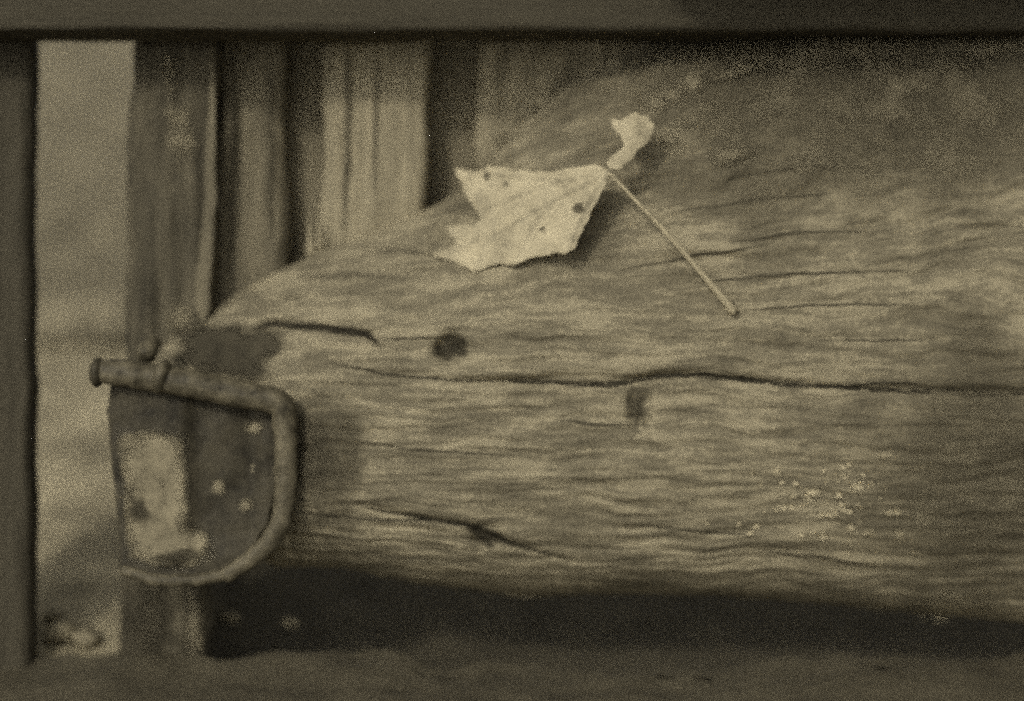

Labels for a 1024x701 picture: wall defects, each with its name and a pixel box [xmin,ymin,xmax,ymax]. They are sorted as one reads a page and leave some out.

crack [211,321,1024,396]
crack [294,505,569,562]